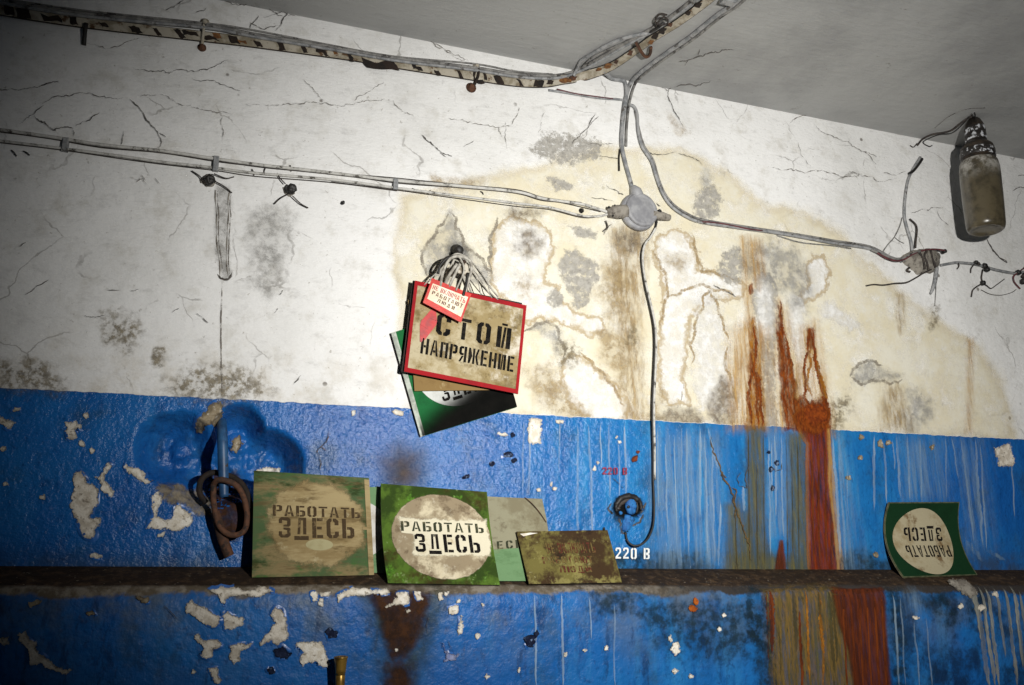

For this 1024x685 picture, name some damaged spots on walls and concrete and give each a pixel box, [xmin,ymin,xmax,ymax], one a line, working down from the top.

crack [0,60,409,147]
crack [422,114,544,157]
crack [773,115,905,182]
water stain [109,321,137,343]
water stain [396,149,1013,438]
corrosion [727,302,842,570]
peeling [994,444,1016,467]
peeling [70,461,212,561]
peeling [186,584,339,684]
peeling [309,586,423,613]
peeling [438,591,481,640]
corrosion [763,586,891,685]